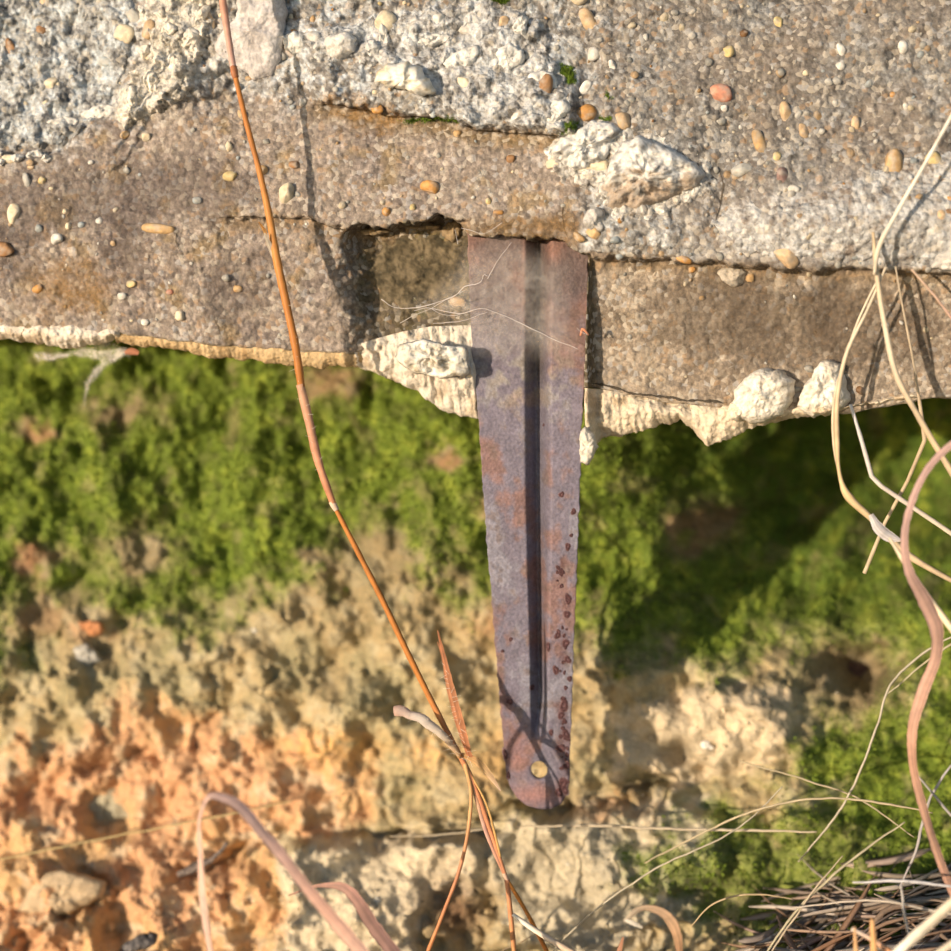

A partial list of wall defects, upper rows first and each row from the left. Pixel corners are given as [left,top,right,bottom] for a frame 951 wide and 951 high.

crack [217,216,363,231]
spalling [357,220,475,323]
crack [588,383,723,411]
rust [546,565,572,798]